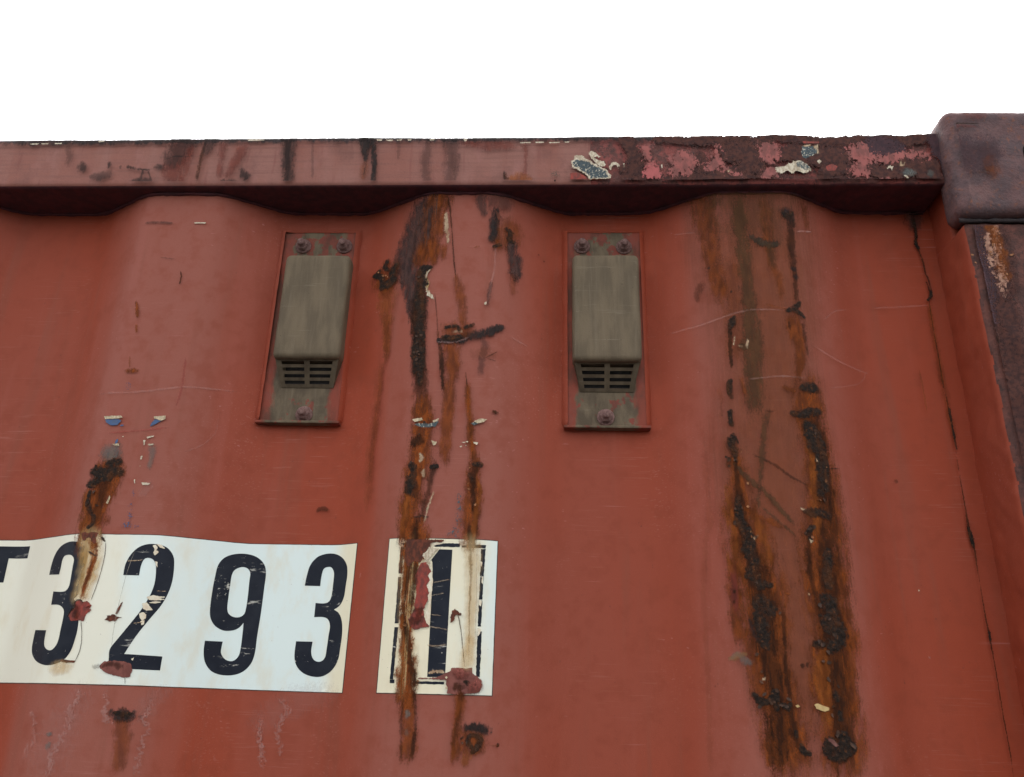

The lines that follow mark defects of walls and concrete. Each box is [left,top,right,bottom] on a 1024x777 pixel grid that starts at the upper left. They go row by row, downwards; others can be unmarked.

peeling [755,140,932,179]
rust [971,225,1024,463]
rust [74,443,125,599]
peeling [104,416,124,444]
rust [373,194,466,761]
peeling [408,547,439,630]
rust [460,373,484,625]
rust [722,208,867,777]
crack [904,212,1013,771]
rust [109,707,139,722]
peeling [418,609,482,760]
rust [457,722,499,766]